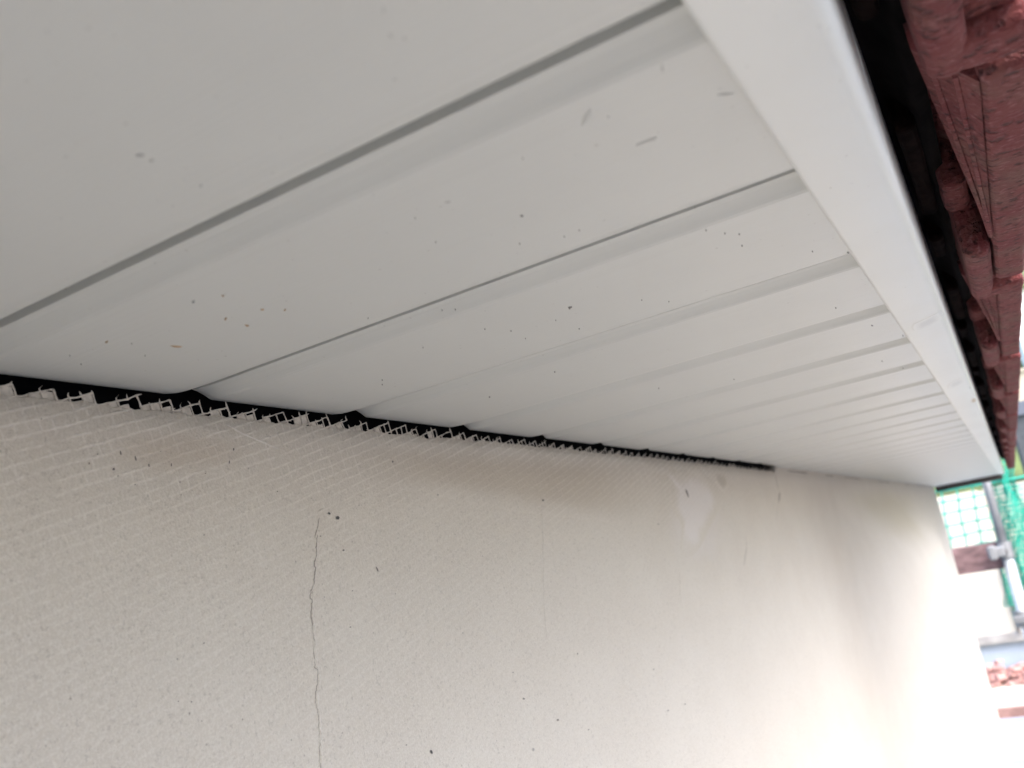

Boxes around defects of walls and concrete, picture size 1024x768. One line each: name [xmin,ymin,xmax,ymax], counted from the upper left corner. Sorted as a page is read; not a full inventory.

crack [309,508,326,768]